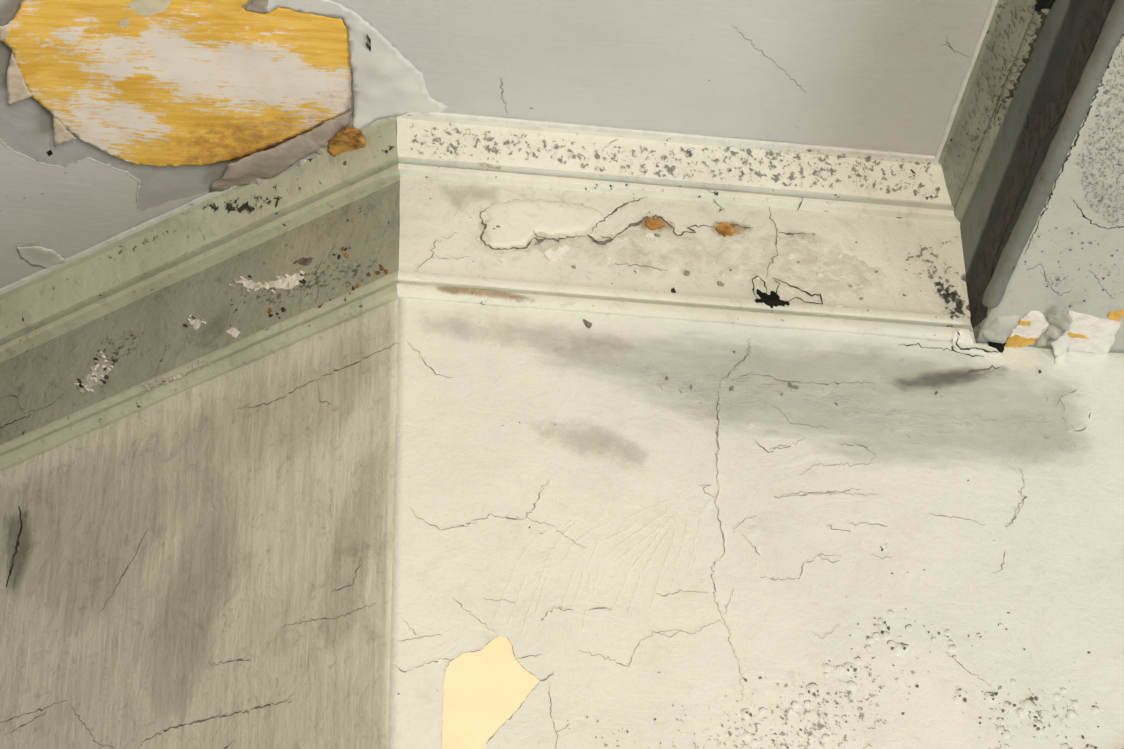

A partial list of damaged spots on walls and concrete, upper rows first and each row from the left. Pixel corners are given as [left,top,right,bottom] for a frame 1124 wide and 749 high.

peeling [0,0,447,211]
crack [418,189,806,274]
corrosion [645,217,664,230]
corrosion [716,222,734,237]
flaking render [229,257,313,293]
peeling [952,310,1124,363]
crack [238,340,452,409]
crack [580,339,883,695]
crack [931,469,1027,573]
crack [283,561,376,627]
crack [0,698,295,749]
peeling [441,636,540,749]